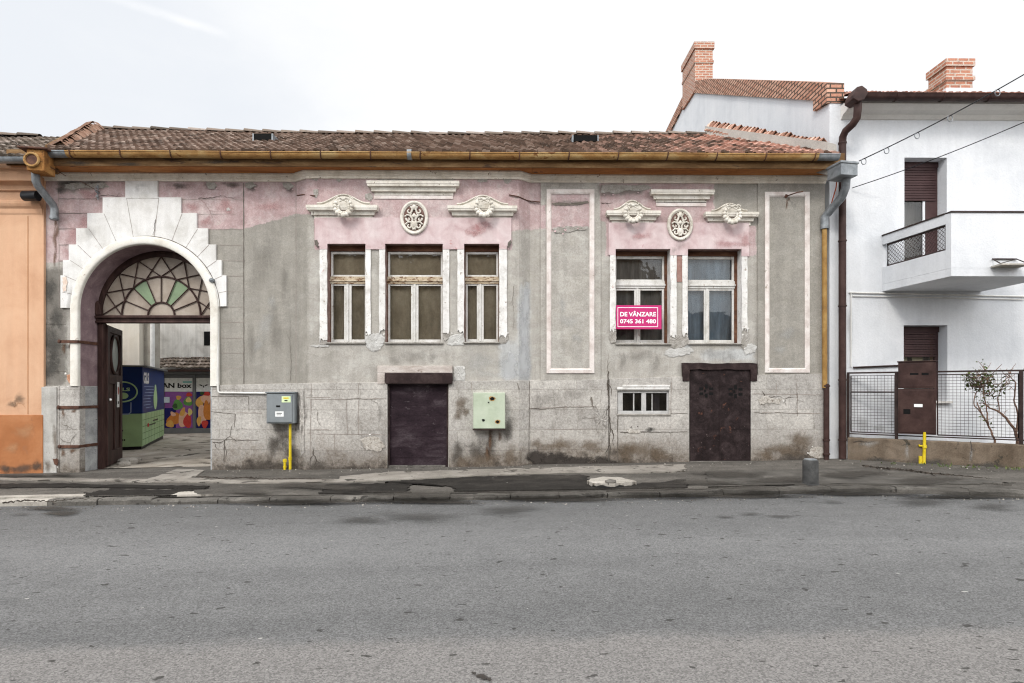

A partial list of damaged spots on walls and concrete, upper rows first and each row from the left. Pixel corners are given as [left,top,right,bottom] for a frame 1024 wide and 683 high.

peeling [552,197,589,210]
spalling [365,333,385,352]
spalling [665,347,694,357]
crack [517,350,671,460]
crack [196,423,334,480]
spalling [360,434,385,452]
water stain [454,440,494,465]
water stain [526,442,664,464]
water stain [2,462,69,477]